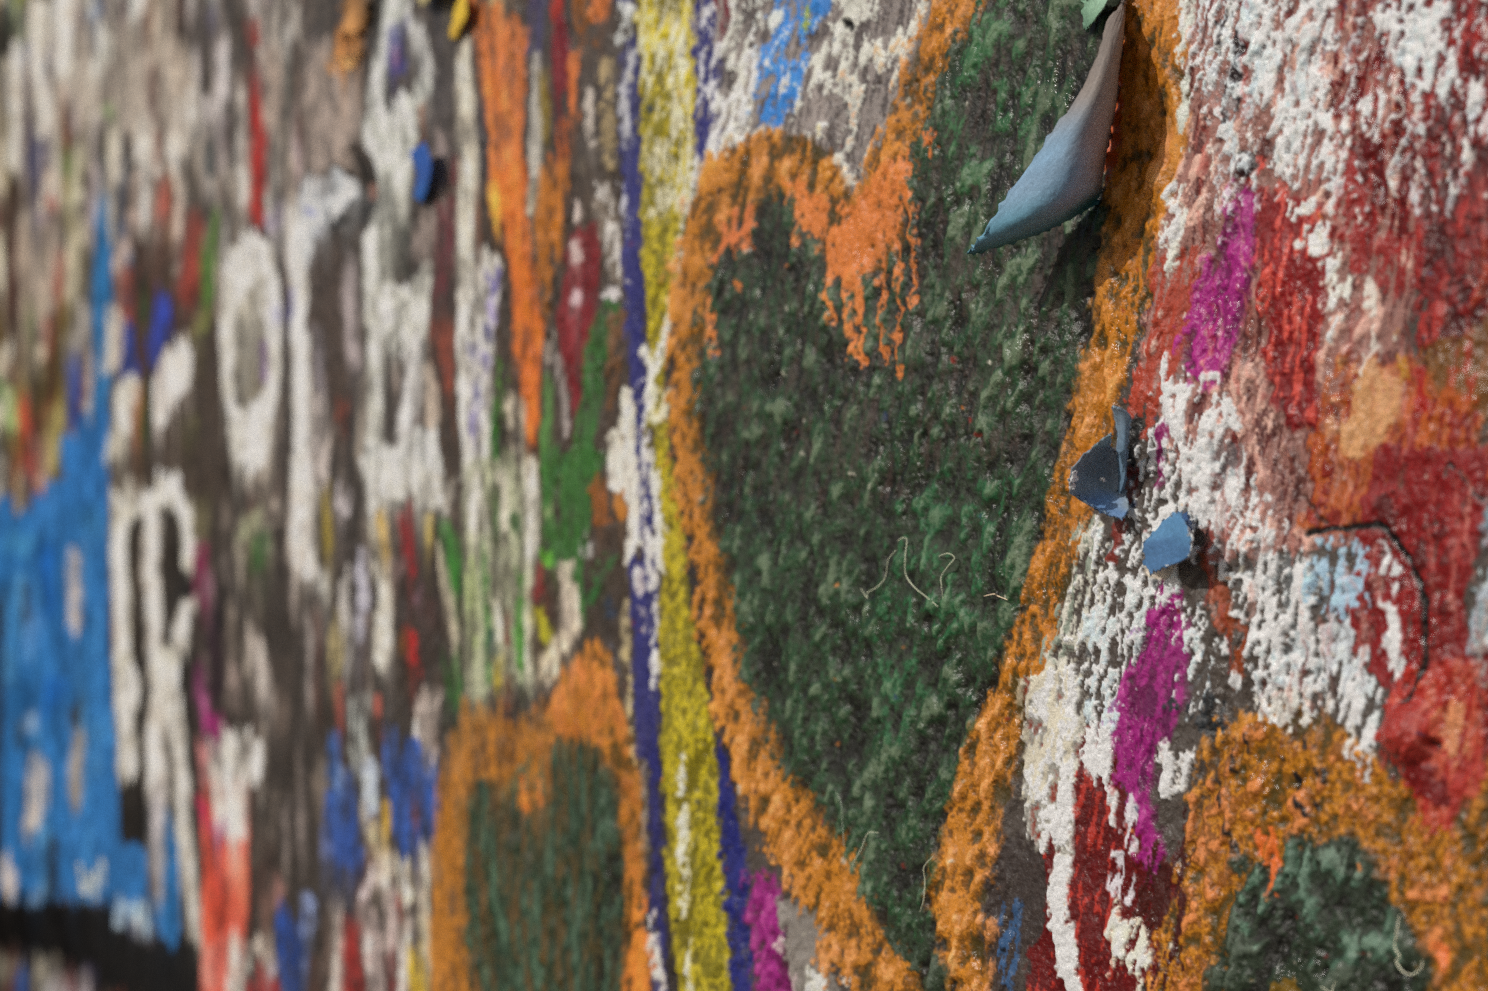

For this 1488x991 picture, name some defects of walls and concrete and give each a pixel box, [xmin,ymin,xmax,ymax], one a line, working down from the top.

peeling [967,0,1128,256]
peeling [1067,405,1146,521]
peeling [1142,510,1194,582]